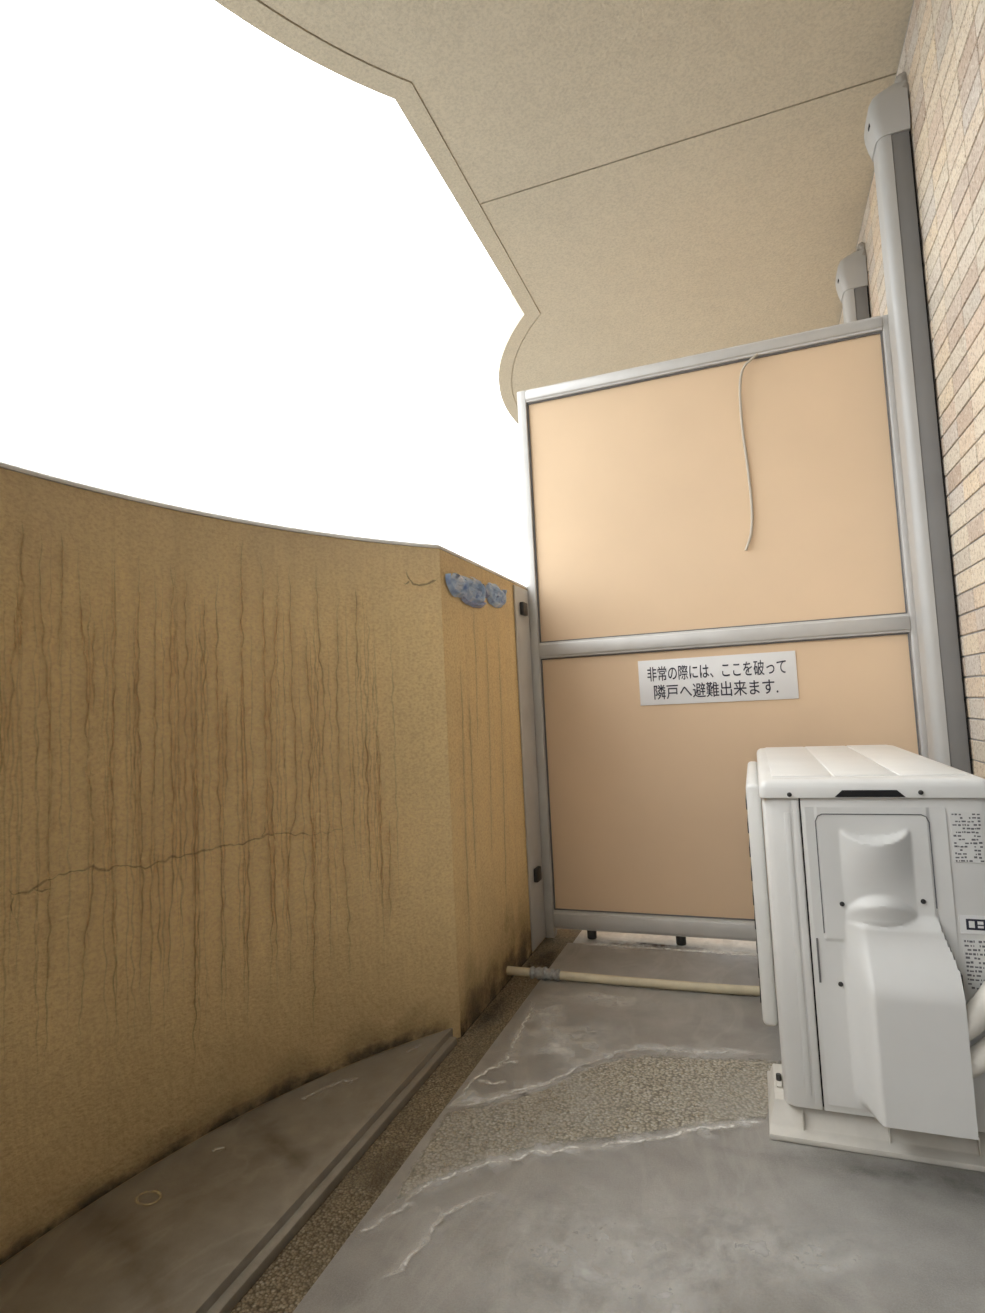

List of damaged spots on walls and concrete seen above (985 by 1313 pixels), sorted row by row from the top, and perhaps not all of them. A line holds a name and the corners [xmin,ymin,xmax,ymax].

leakage [208,1073,332,1133]
leakage [464,1006,572,1105]